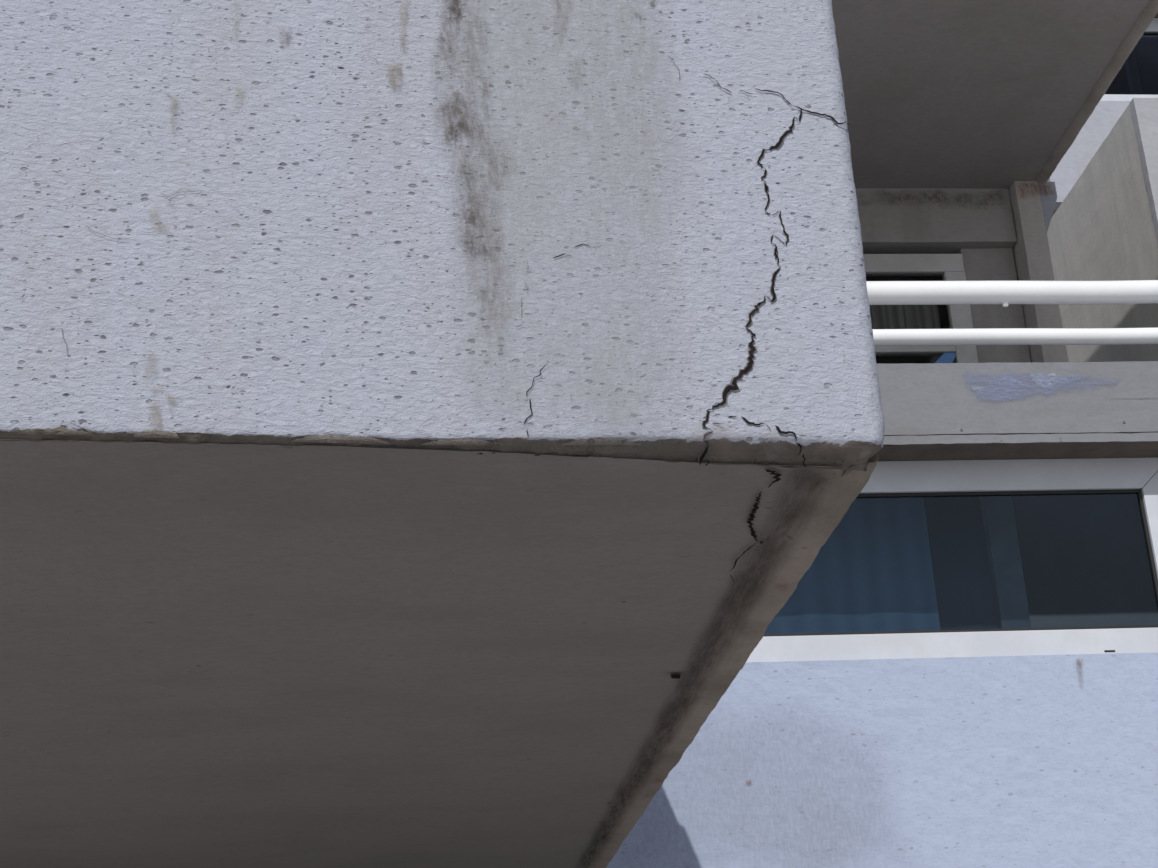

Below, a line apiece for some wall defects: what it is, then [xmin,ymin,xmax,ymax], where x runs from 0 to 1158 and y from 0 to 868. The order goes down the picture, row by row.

crack [670,57,850,583]